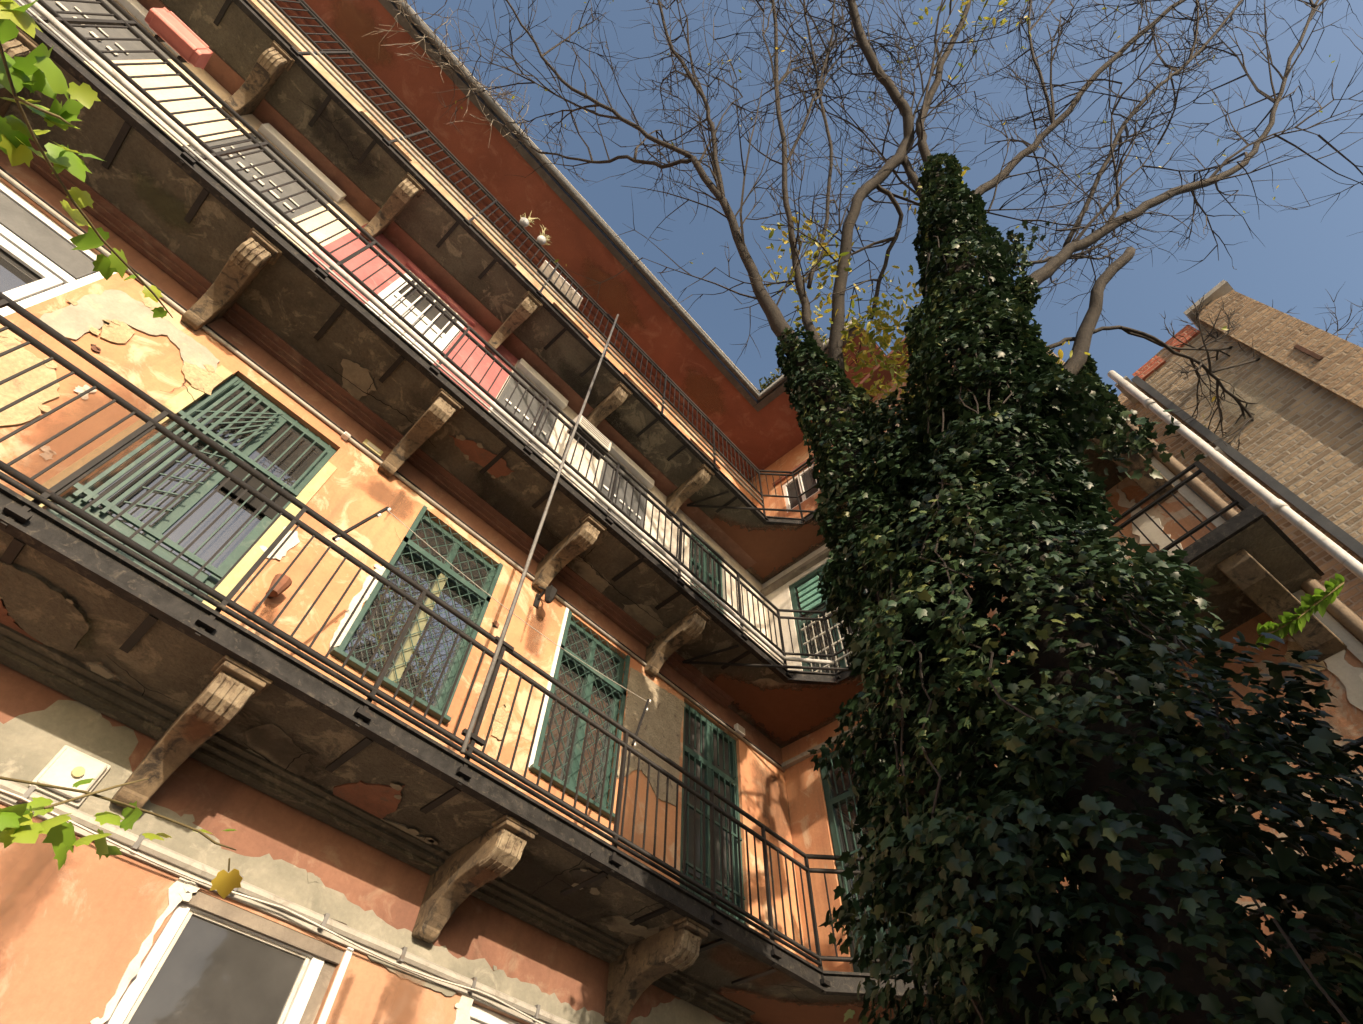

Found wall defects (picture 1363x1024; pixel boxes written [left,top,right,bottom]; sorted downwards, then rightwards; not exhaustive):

peeling [89,319,135,352]
peeling [0,329,97,427]
peeling [1282,638,1363,711]
peeling [333,780,438,845]
peeling [366,954,461,1009]